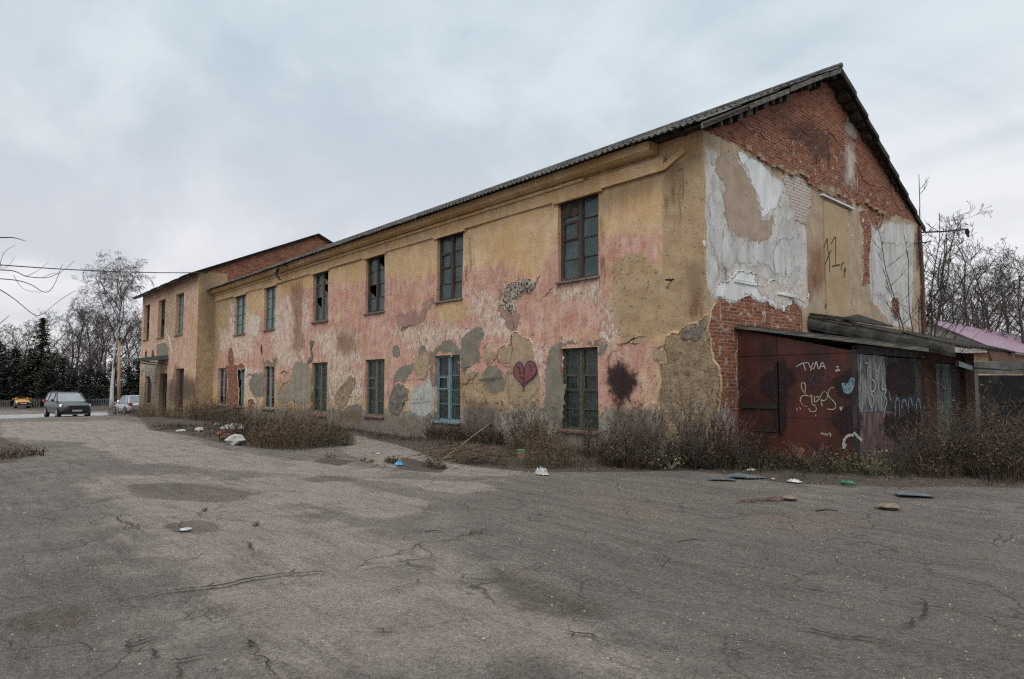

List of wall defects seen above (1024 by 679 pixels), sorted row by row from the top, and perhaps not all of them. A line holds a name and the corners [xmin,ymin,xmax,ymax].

peeling [277,333,315,409]
peeling [334,375,363,414]
flaking render [388,276,612,446]
flaking render [646,117,910,456]